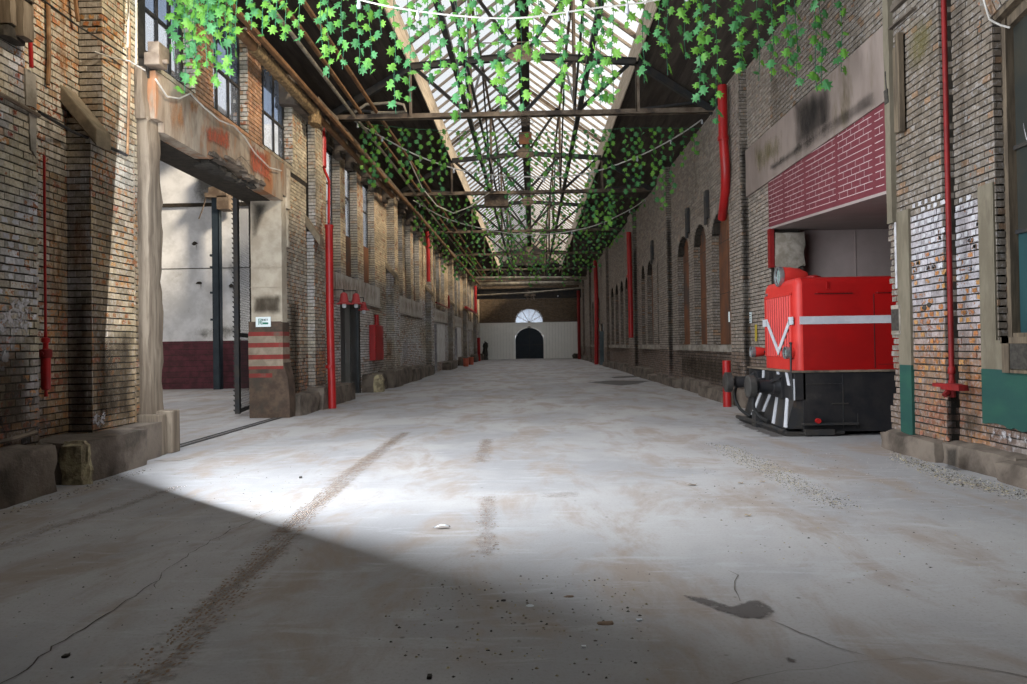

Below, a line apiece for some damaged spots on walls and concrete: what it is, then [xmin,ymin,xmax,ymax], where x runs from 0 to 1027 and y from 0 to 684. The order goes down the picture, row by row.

crack [0,511,270,684]
leakage [688,596,774,618]